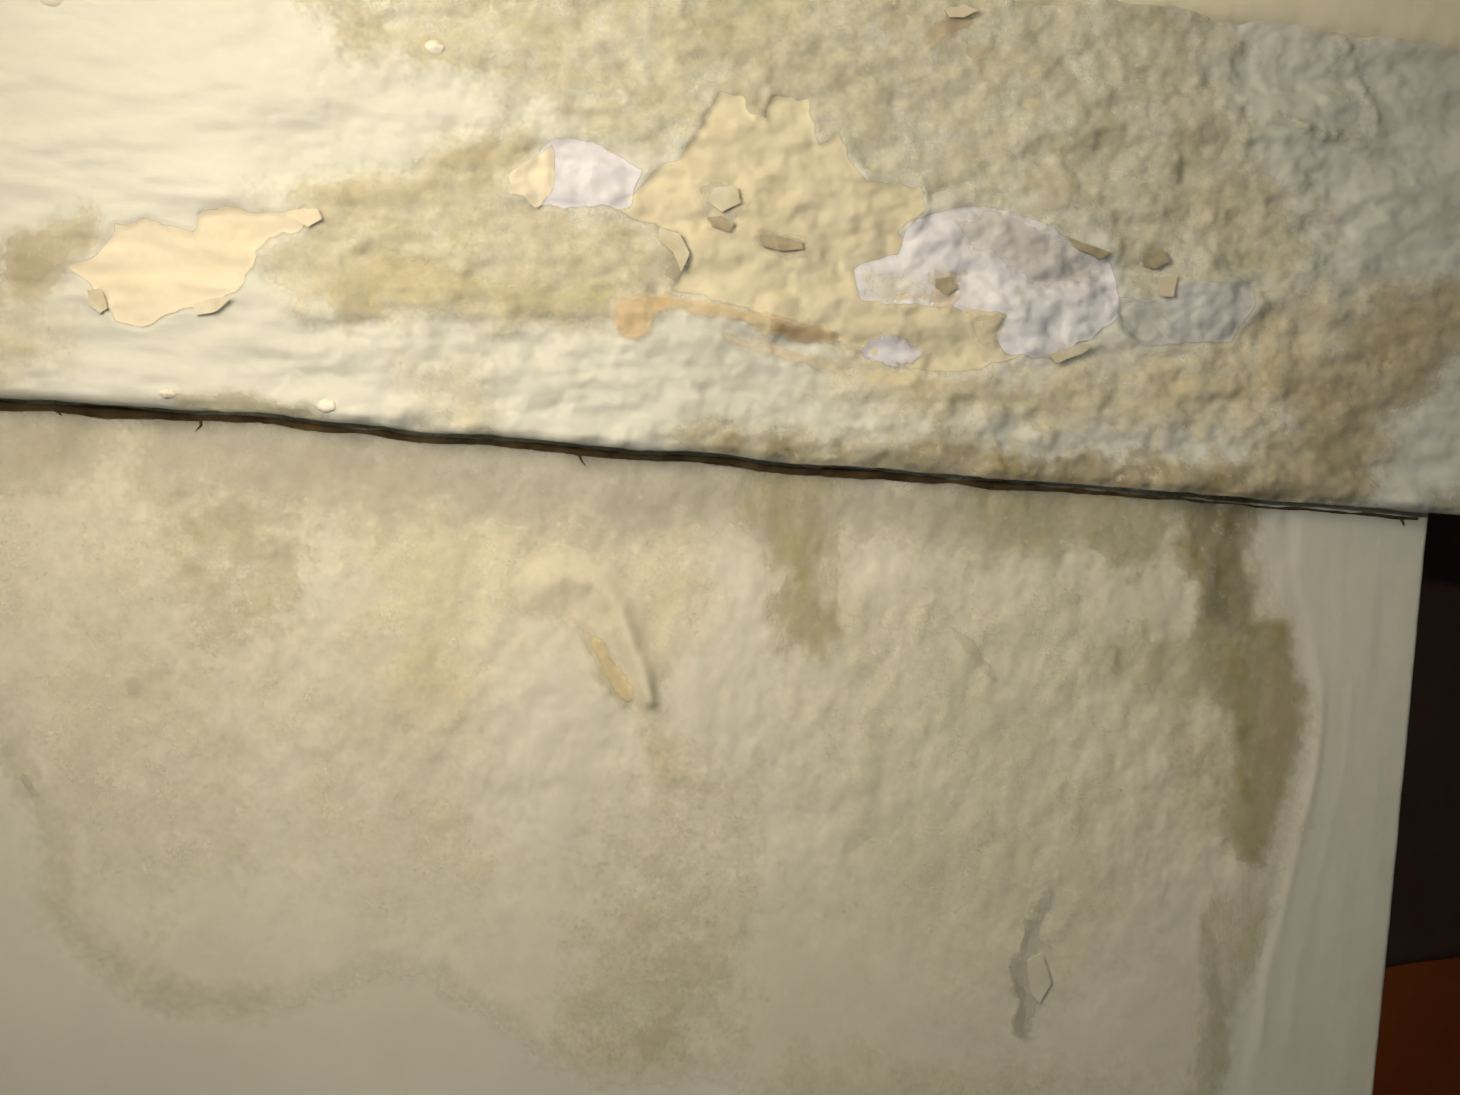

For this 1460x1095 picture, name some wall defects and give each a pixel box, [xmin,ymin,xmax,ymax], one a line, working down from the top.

damp [0,218,97,357]
peeling [68,206,322,327]
damp [258,132,674,334]
peeling [509,92,1256,372]
crack [0,399,1419,526]
damp [0,280,1460,1095]